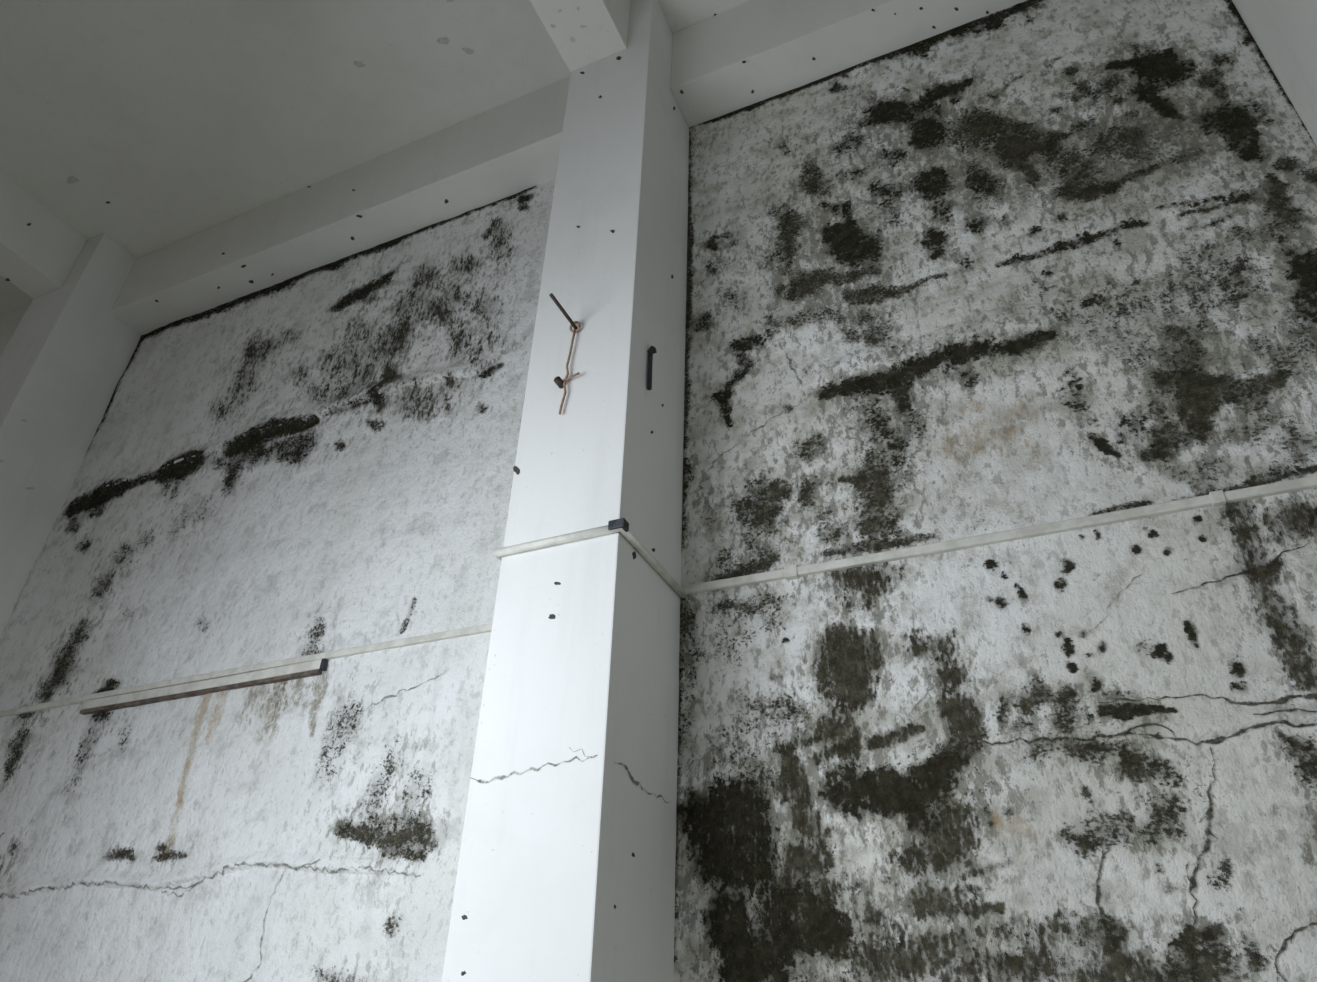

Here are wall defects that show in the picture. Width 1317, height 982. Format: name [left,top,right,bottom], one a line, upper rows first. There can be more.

water stain [3,186,536,792]
water stain [674,0,1317,982]
water stain [102,847,134,863]
water stain [153,842,187,862]
water stain [332,736,438,863]
crack [470,747,669,803]
crack [940,693,1317,981]
crack [0,859,420,982]